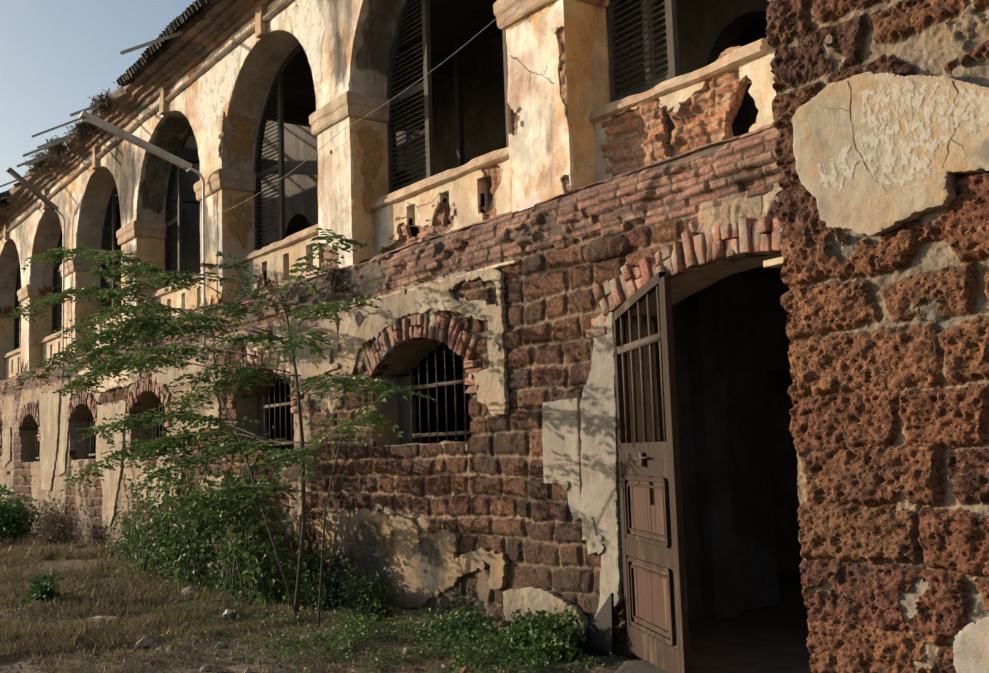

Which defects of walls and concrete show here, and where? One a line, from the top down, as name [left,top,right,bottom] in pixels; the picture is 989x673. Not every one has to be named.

damp [328,0,350,85]
damp [357,0,401,76]
peeling [358,127,383,213]
flaking render [382,199,456,253]
flaking render [480,164,502,220]
flaking render [601,68,755,176]
crack [824,83,886,193]
peeling [819,80,989,189]
crack [942,81,966,168]
damp [347,522,393,589]
damp [418,535,445,594]